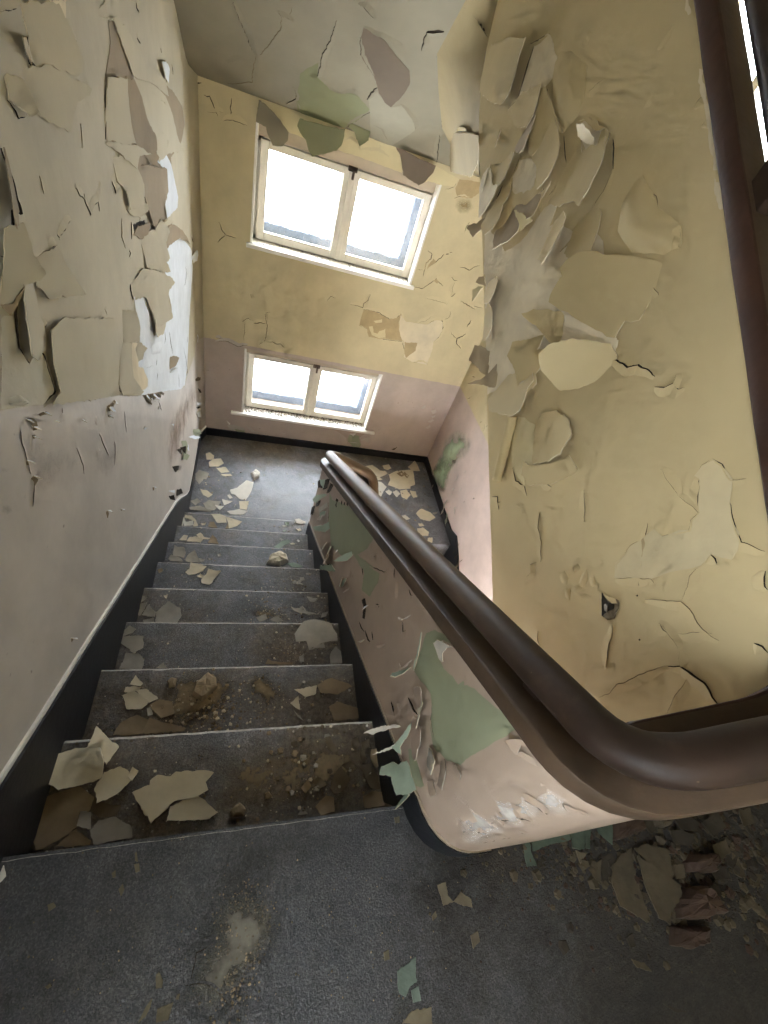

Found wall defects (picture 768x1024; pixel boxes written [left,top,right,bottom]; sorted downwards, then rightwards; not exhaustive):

crack [75,181,121,216]
peeling [0,0,202,472]
peeling [256,20,662,497]
peeling [698,69,723,209]
peeling [366,460,474,543]
crack [532,630,540,646]
spalling [601,593,620,620]
crack [599,555,719,714]
peeling [614,459,765,587]
crack [751,570,768,592]
crack [753,643,768,655]
peeling [360,630,537,809]